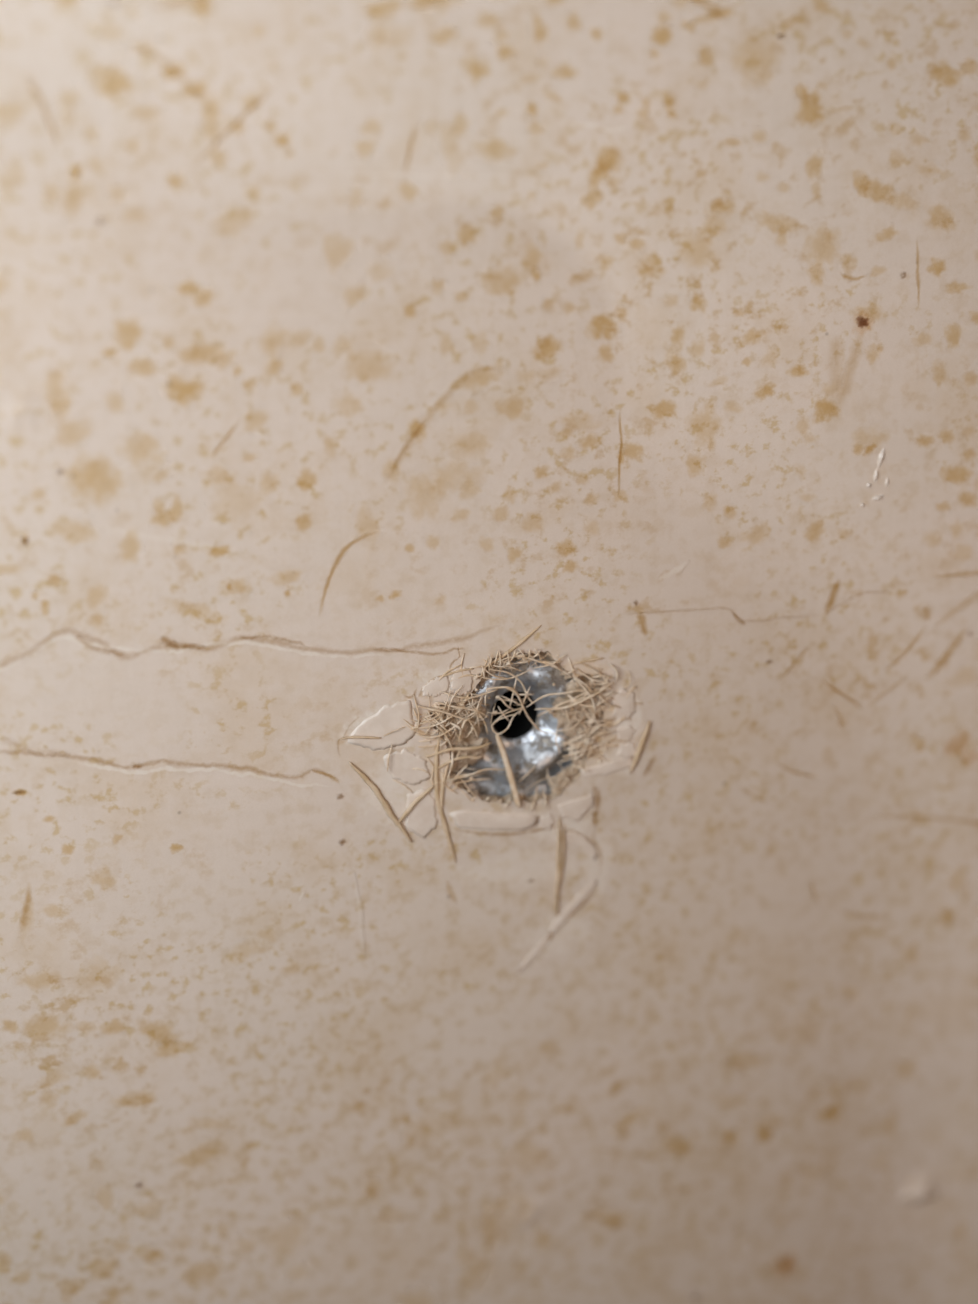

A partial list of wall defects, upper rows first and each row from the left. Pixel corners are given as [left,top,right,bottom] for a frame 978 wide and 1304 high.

crack [70,759,336,789]